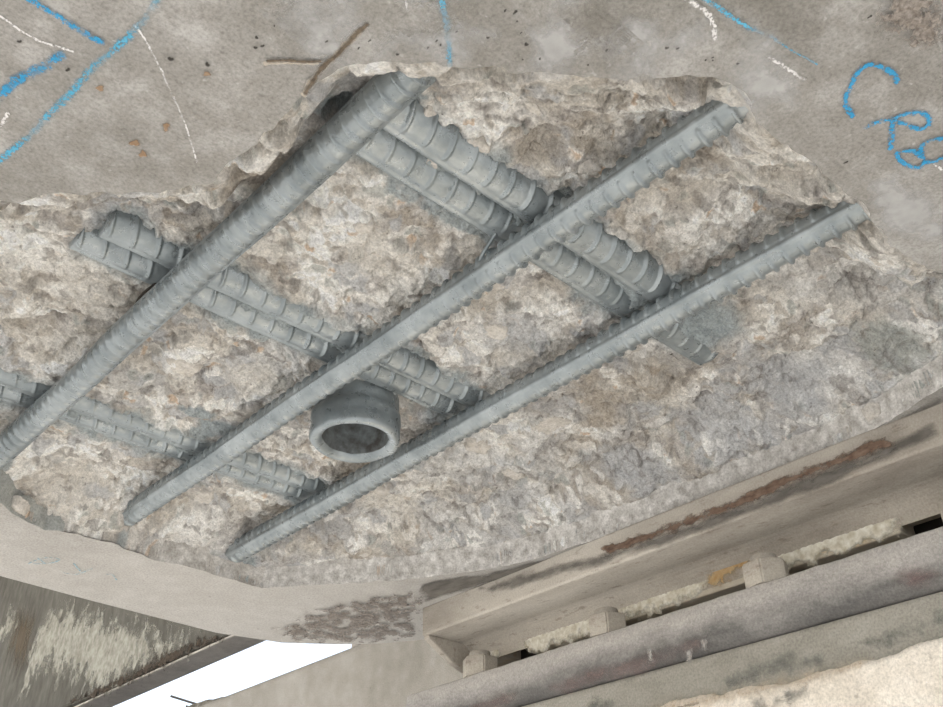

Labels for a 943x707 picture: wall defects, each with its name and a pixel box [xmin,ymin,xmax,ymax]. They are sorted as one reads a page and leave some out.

spalling [0,61,943,588]
corrosion [601,437,892,554]
efflorescence [0,604,18,641]
efflorescence [21,604,189,694]
spalling [284,593,421,643]